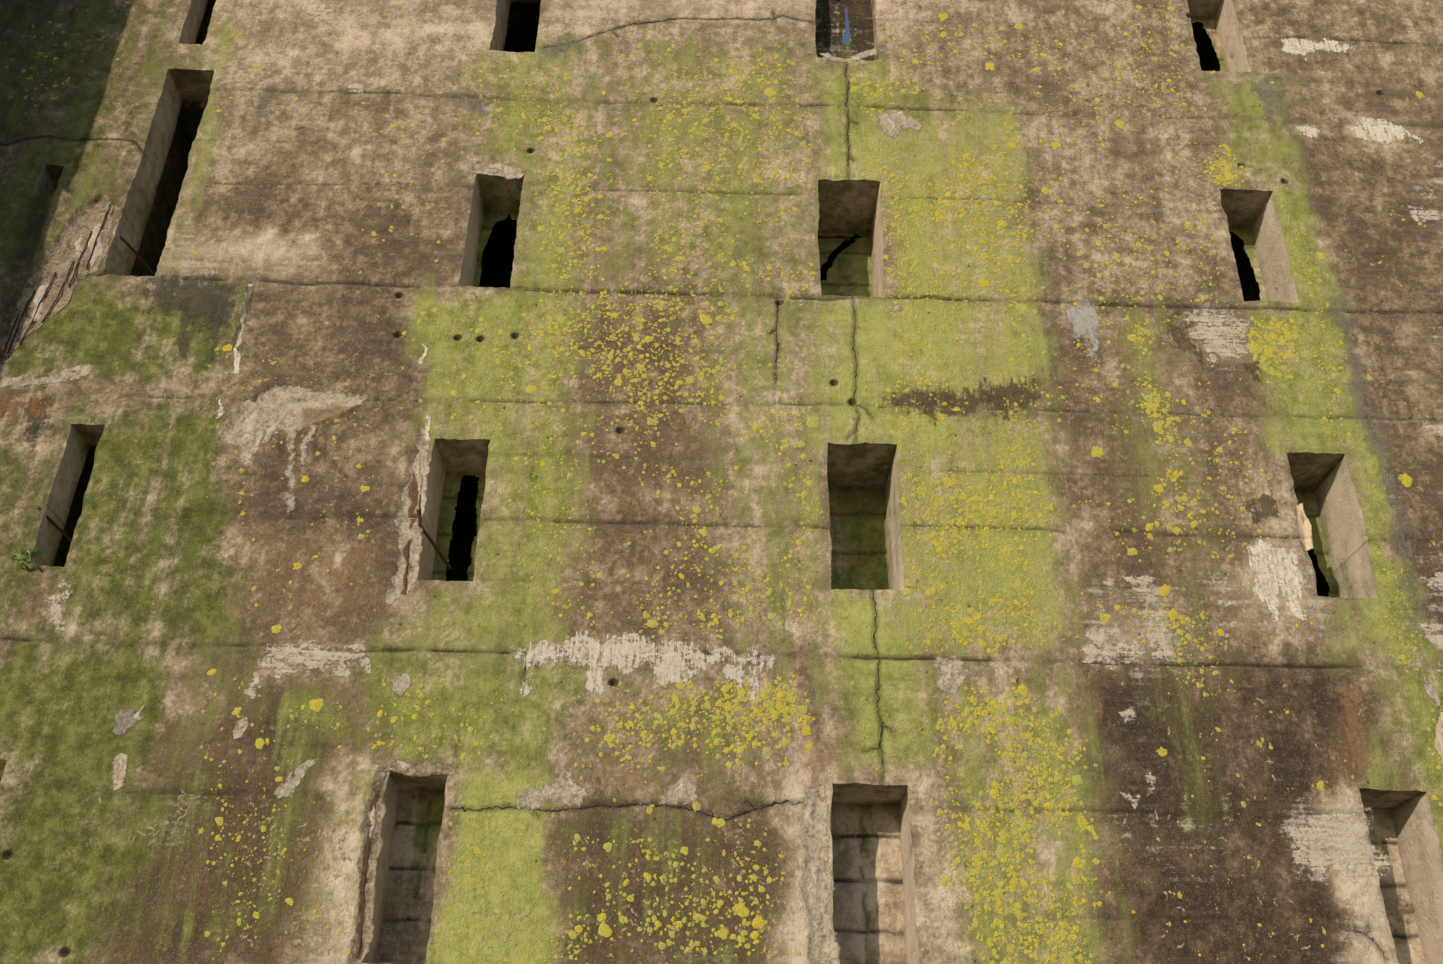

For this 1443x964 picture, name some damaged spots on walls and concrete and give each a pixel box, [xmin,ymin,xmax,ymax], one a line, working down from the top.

crack [0,135,155,167]
crack [845,62,858,178]
crack [847,298,869,438]
leakage [883,376,1040,426]
spalling [217,385,368,511]
peeling [1424,676,1443,761]
crack [451,800,802,820]